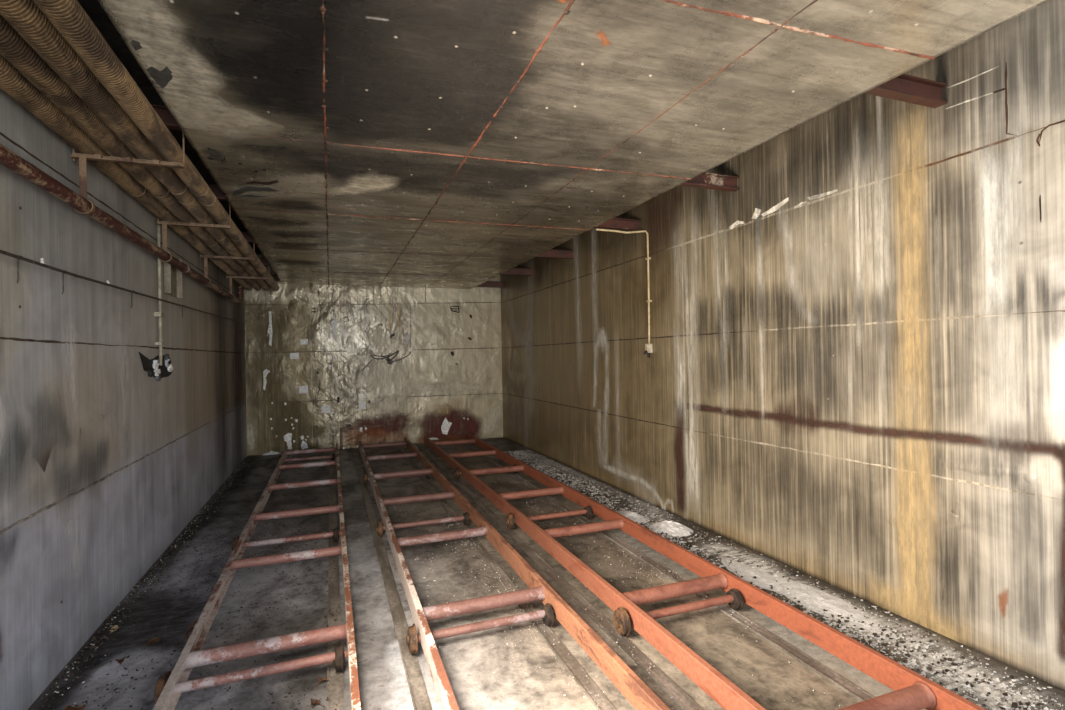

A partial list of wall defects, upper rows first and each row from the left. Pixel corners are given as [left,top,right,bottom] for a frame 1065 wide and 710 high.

water stain [267,150,557,197]
water stain [812,96,883,333]
water stain [980,161,1013,305]
water stain [758,189,775,409]
rust [344,413,408,442]
rust [420,406,481,442]
water stain [594,330,608,440]
water stain [677,344,698,500]
water stain [604,454,673,514]
water stain [706,545,823,592]
water stain [41,593,207,710]
water stain [863,612,1033,710]